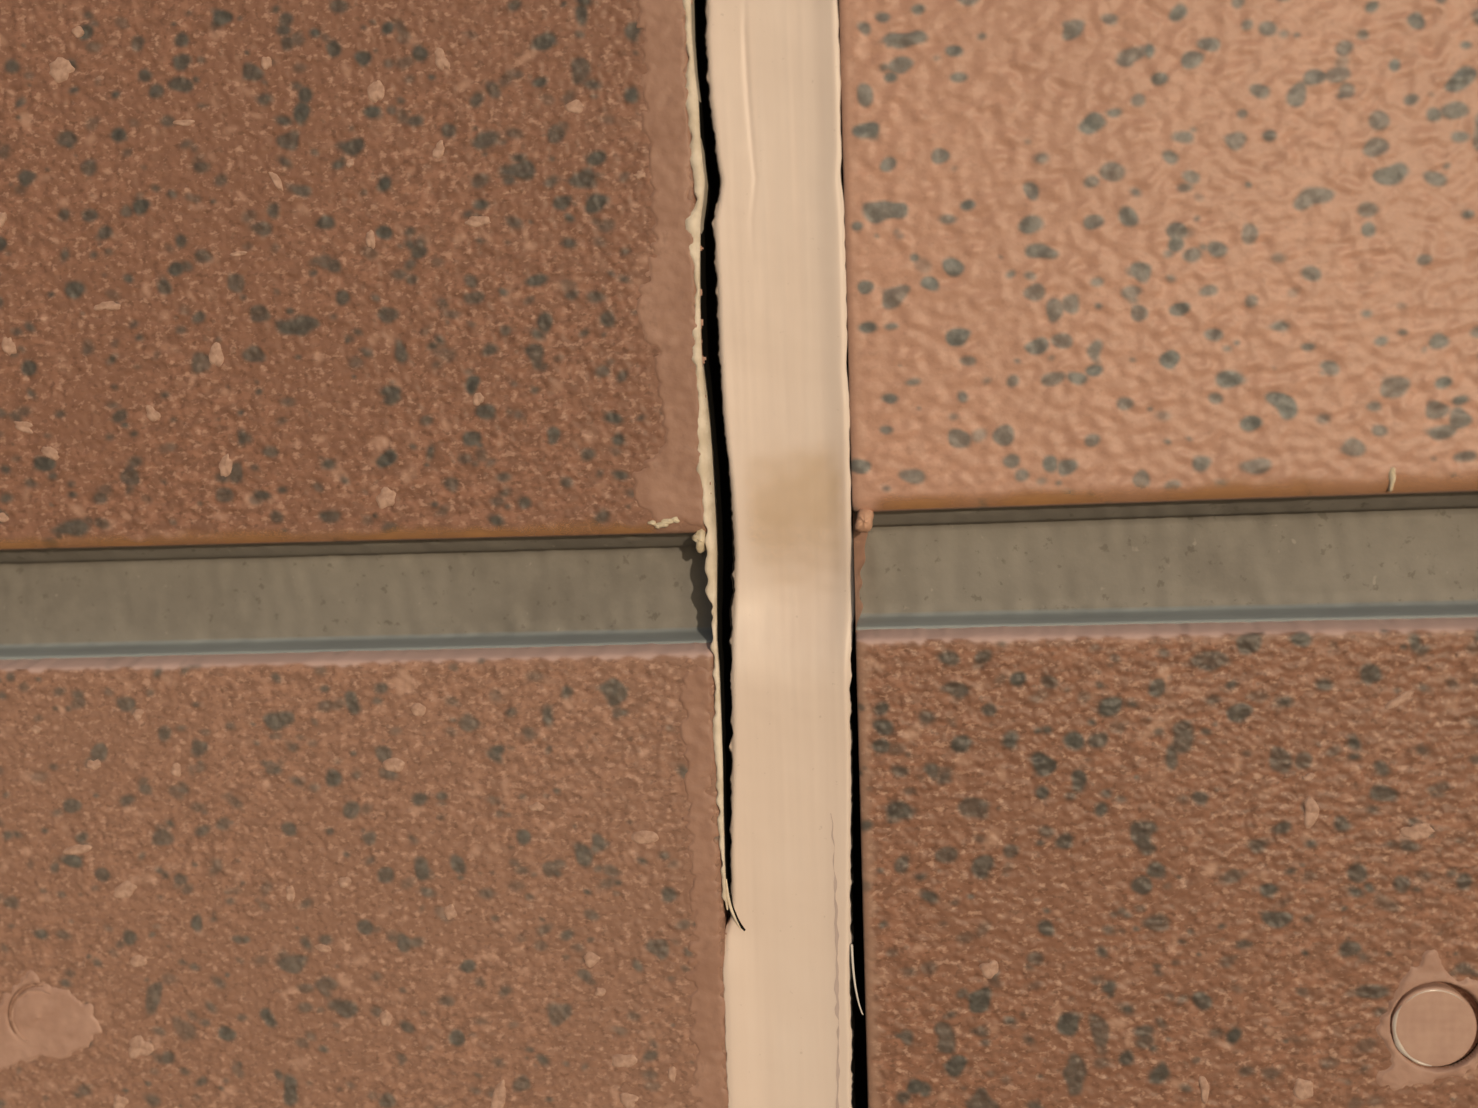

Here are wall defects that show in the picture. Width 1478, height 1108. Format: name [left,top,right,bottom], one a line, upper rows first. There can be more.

crack [683,0,746,931]
crack [837,0,845,226]
crack [845,262,868,1108]